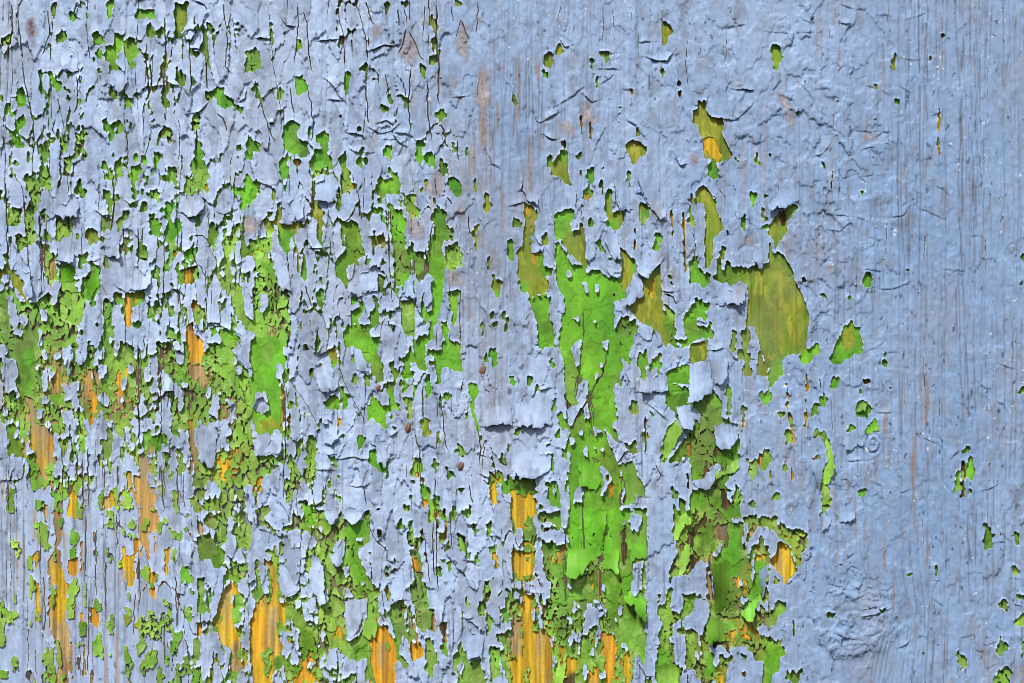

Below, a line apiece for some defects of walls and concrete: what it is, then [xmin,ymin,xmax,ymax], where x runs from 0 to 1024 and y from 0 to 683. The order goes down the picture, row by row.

peeling [541,33,576,78]
crack [602,8,662,56]
peeling [635,21,677,77]
crack [661,12,701,97]
peeling [532,47,623,186]
peeling [621,111,651,165]
peeling [678,90,756,180]
peeling [0,0,469,683]
peeling [829,320,902,367]
peeling [452,167,820,683]
peeling [410,442,480,565]
peeling [947,446,1000,498]